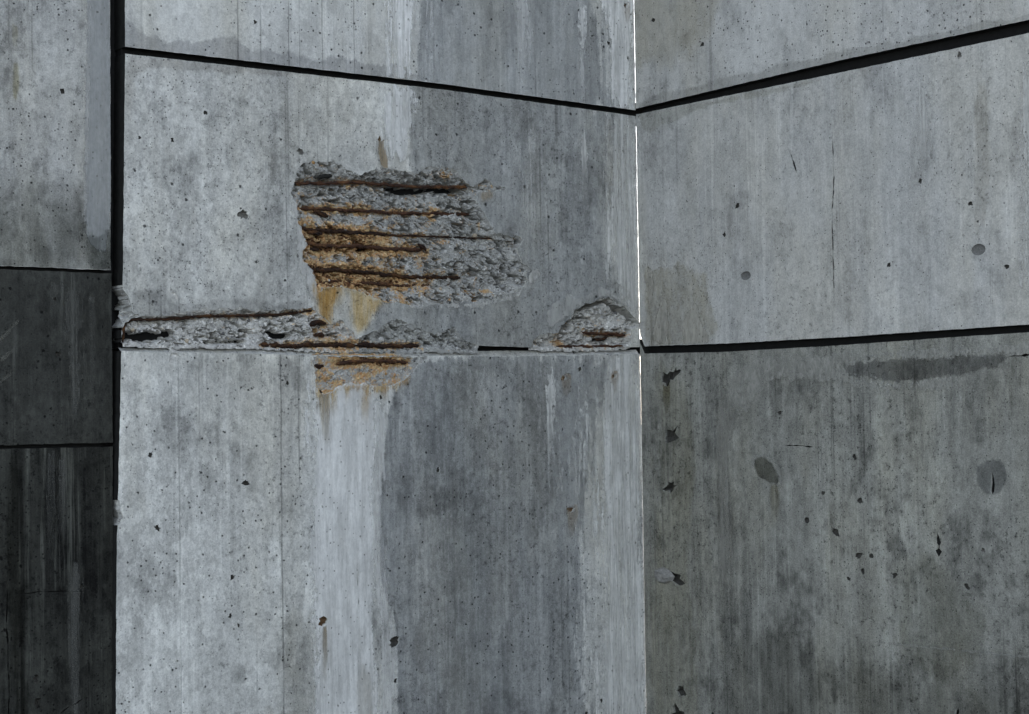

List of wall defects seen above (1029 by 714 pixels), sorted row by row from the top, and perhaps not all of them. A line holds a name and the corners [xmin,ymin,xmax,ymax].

spalling [291,160,530,306]
spalling [114,291,479,394]
spalling [528,297,640,352]
peeling [646,272,709,345]